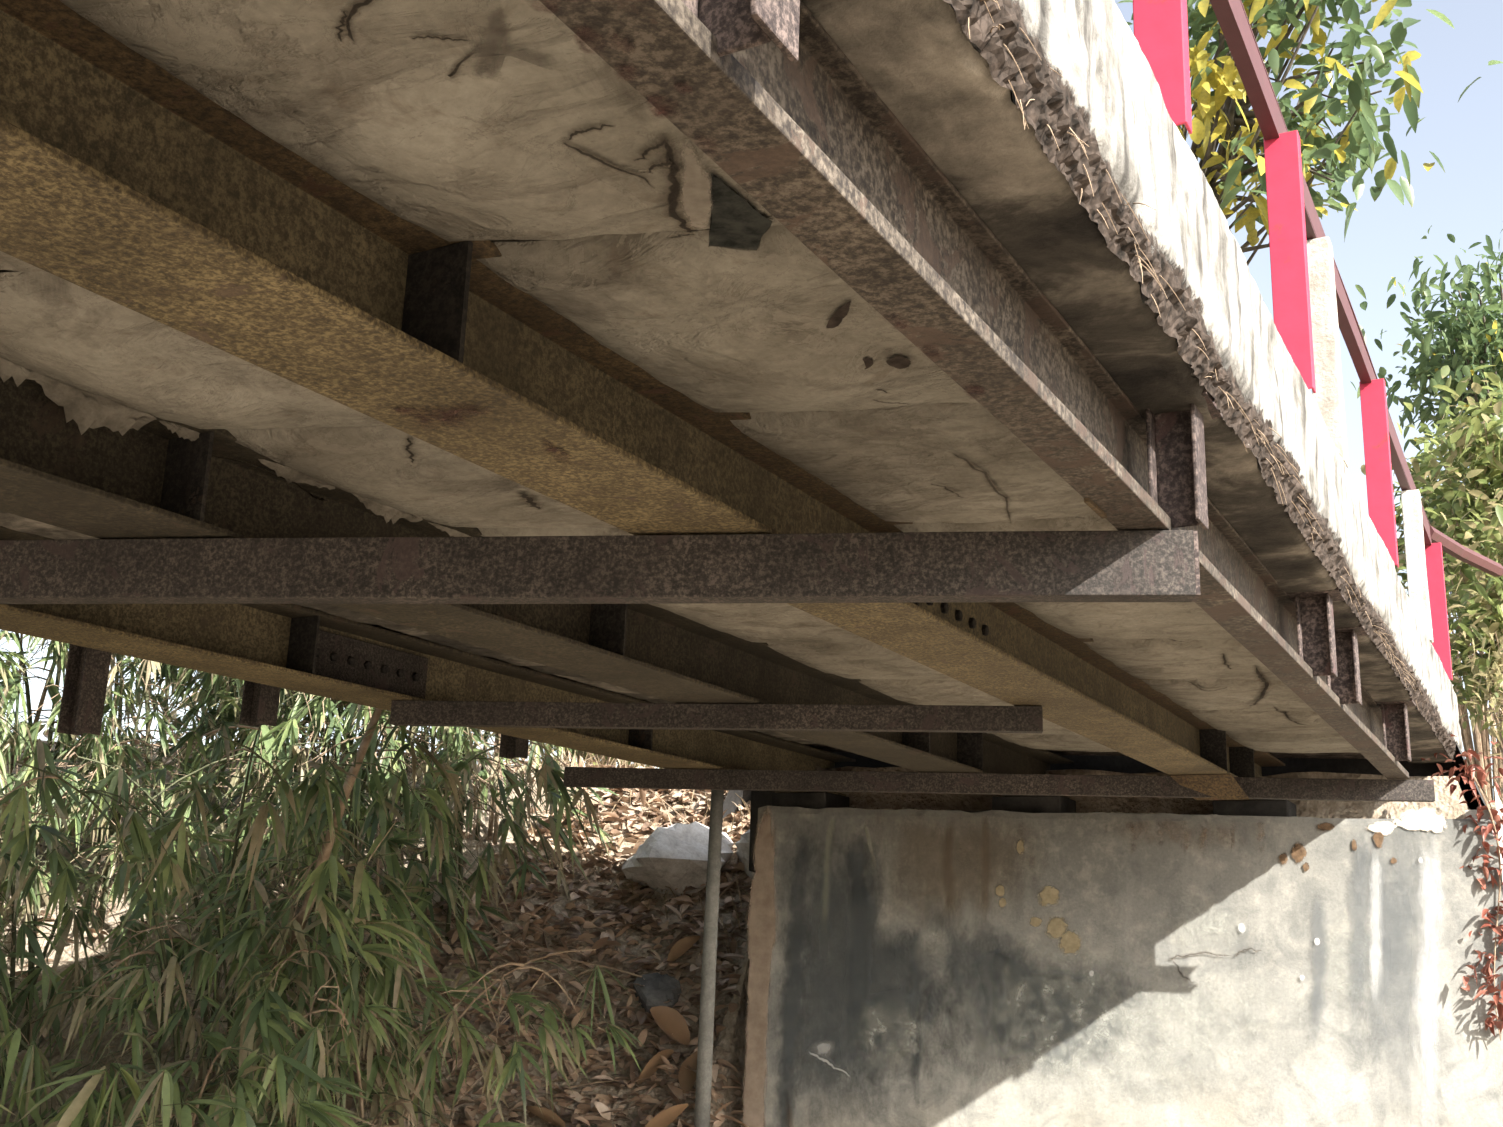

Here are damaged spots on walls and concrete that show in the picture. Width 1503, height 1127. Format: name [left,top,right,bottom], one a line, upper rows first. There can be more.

crack [335,0,373,42]
crack [563,124,694,238]
peeling [0,358,200,441]
spalling [1279,843,1309,871]
spalling [1317,822,1335,831]
spalling [1352,807,1447,864]
leakage [742,810,1221,1127]
leakage [1315,866,1380,990]
leakage [1419,858,1440,1077]